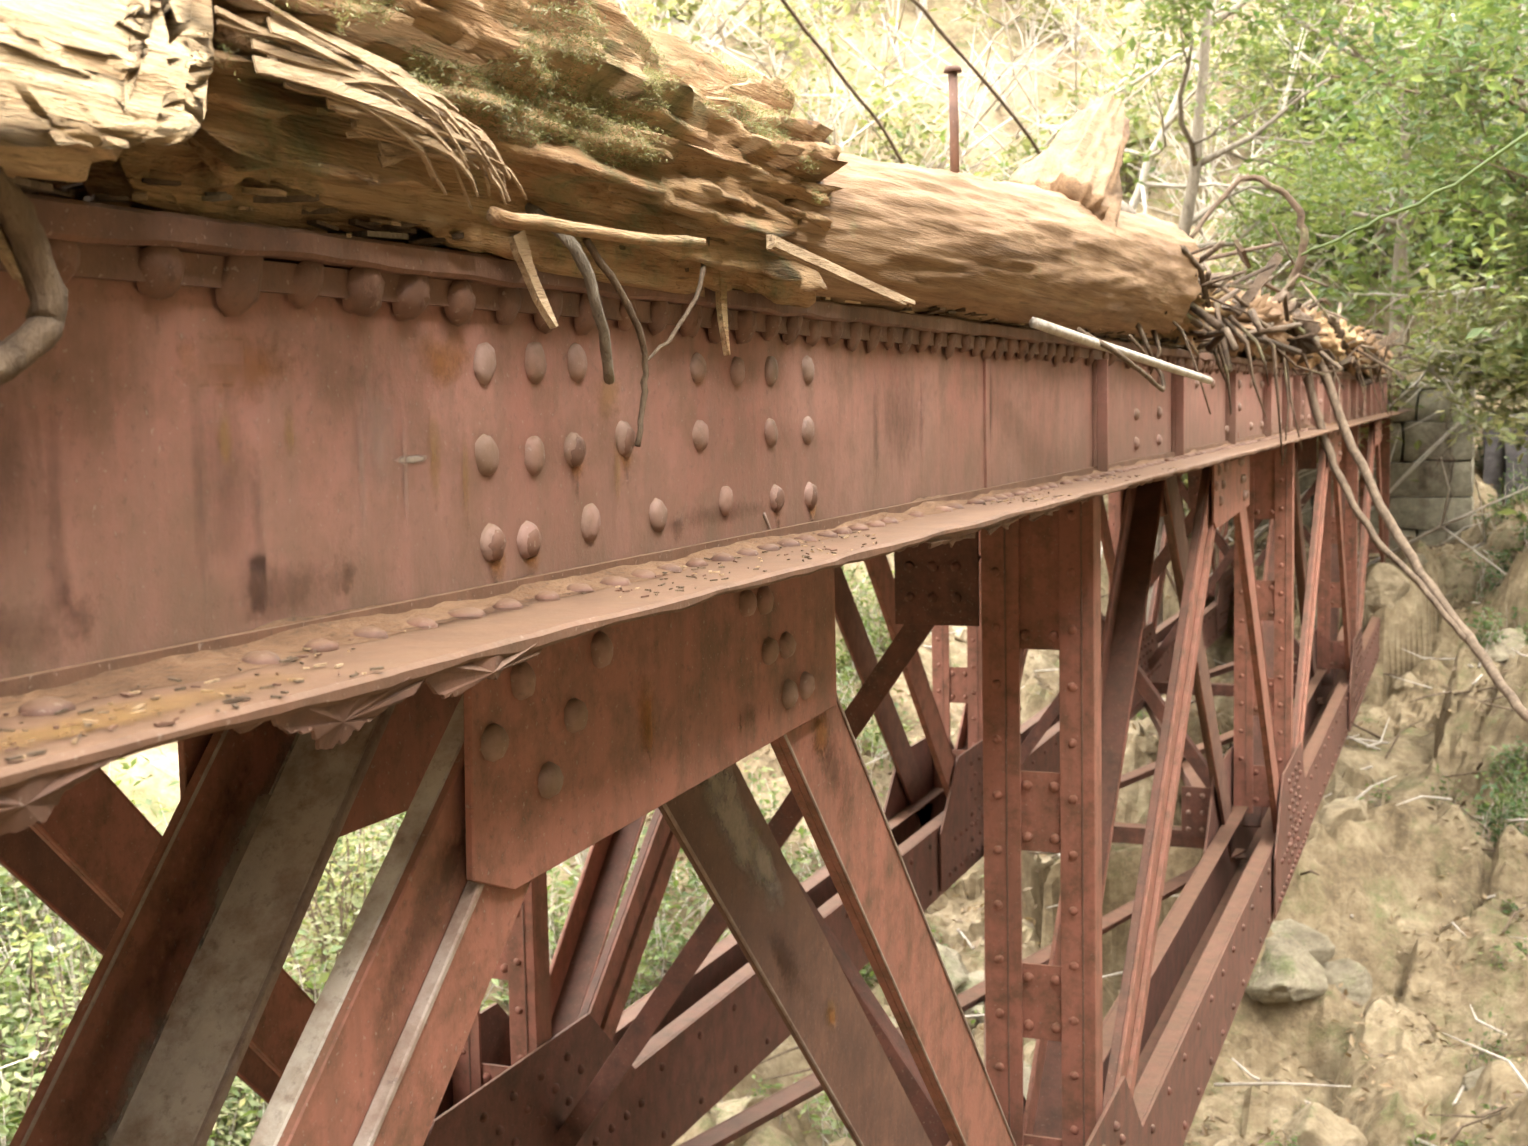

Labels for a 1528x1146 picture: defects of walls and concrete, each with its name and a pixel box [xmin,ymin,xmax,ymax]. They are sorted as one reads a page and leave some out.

rust [570,437,586,472]
rust [809,485,818,512]
rust [488,529,507,566]
rust [527,529,542,564]
rust [926,506,1061,549]
rust [203,643,543,750]
peeling [211,745,293,915]
peeling [94,1019,161,1146]